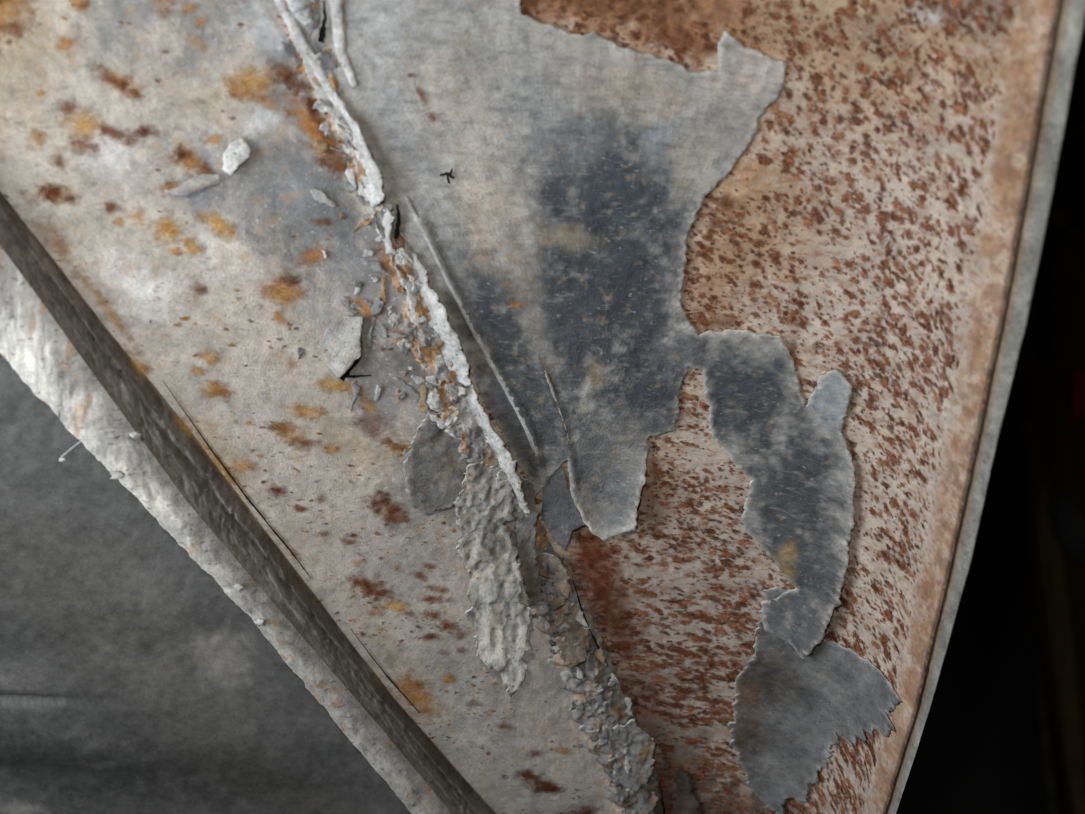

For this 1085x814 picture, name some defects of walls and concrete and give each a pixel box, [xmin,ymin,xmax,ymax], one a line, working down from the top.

corrosion [39,91,152,152]
corrosion [105,71,140,98]
peeling [164,174,221,196]
corrosion [176,149,212,174]
crack [393,204,401,239]
crack [340,320,371,381]
peeling [281,0,902,814]
crack [163,381,311,578]
corrosion [205,399,341,533]
corrosion [330,565,464,652]
crack [572,576,609,666]
crack [351,629,420,713]